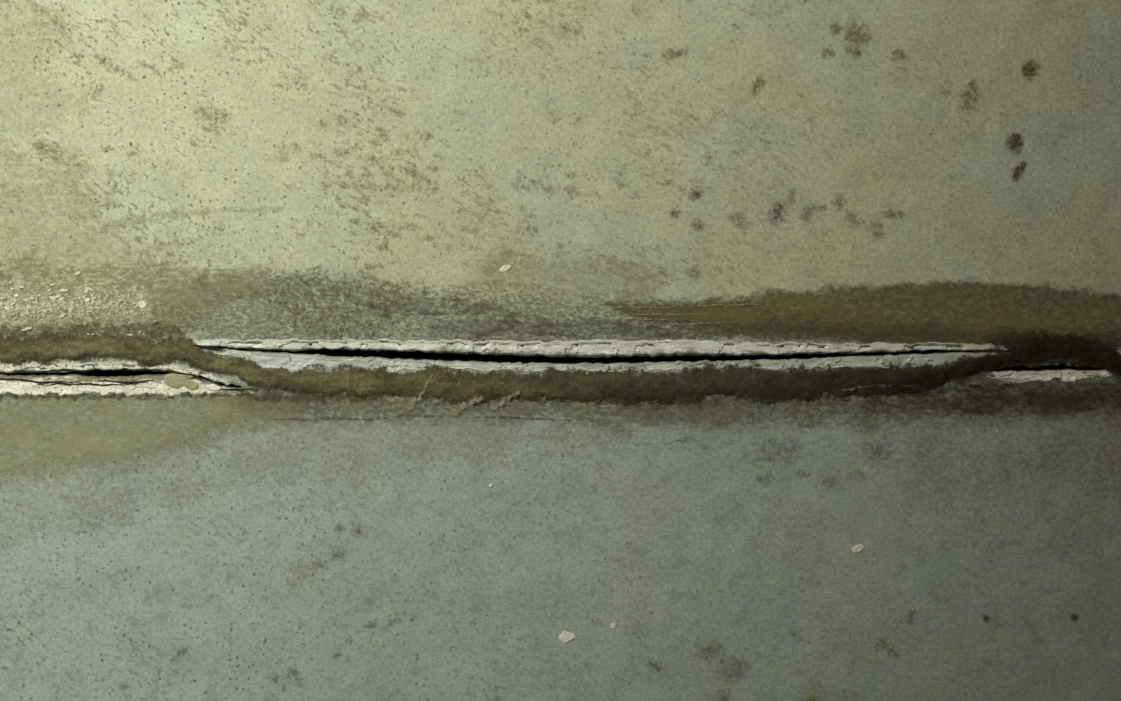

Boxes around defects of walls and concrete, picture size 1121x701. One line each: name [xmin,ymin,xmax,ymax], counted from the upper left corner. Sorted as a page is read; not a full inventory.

damp [0,258,1121,475]
crack [0,338,1121,397]